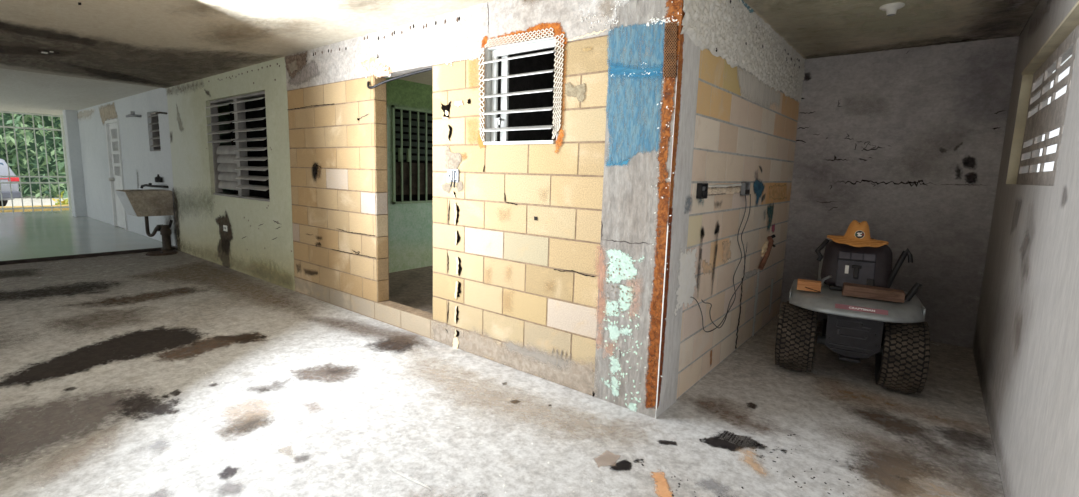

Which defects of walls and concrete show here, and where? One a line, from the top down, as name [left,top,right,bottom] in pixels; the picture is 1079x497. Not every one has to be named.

leakage [0,46,158,84]
corrosion [470,23,567,153]
corrosion [629,0,685,409]
peeling [579,0,811,166]
crack [796,98,981,190]
mould [813,0,1037,57]
crack [446,191,462,349]
corrosion [596,246,613,355]
peeling [601,249,644,412]